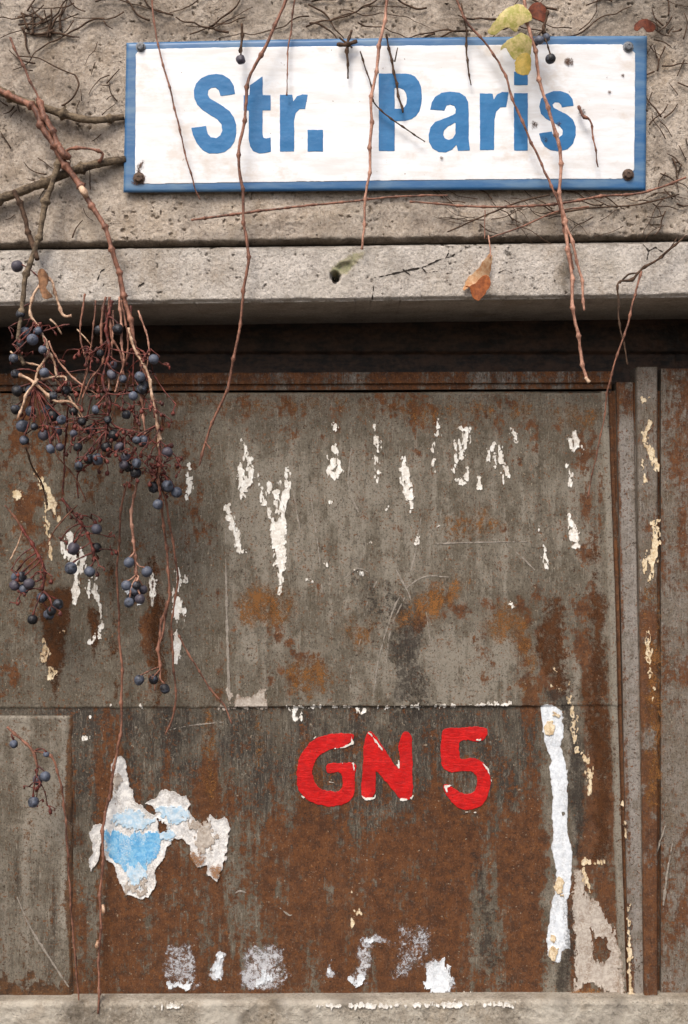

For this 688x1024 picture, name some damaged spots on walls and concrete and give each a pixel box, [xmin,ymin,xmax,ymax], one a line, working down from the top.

peeling [326,422,344,481]
peeling [399,456,415,513]
peeling [451,426,482,490]
peeling [486,427,518,485]
peeling [33,469,104,645]
peeling [223,438,291,701]
peeling [567,513,580,549]
peeling [642,519,661,583]
rust [237,584,295,629]
rust [487,547,616,866]
rust [642,588,666,808]
peeling [541,682,634,994]